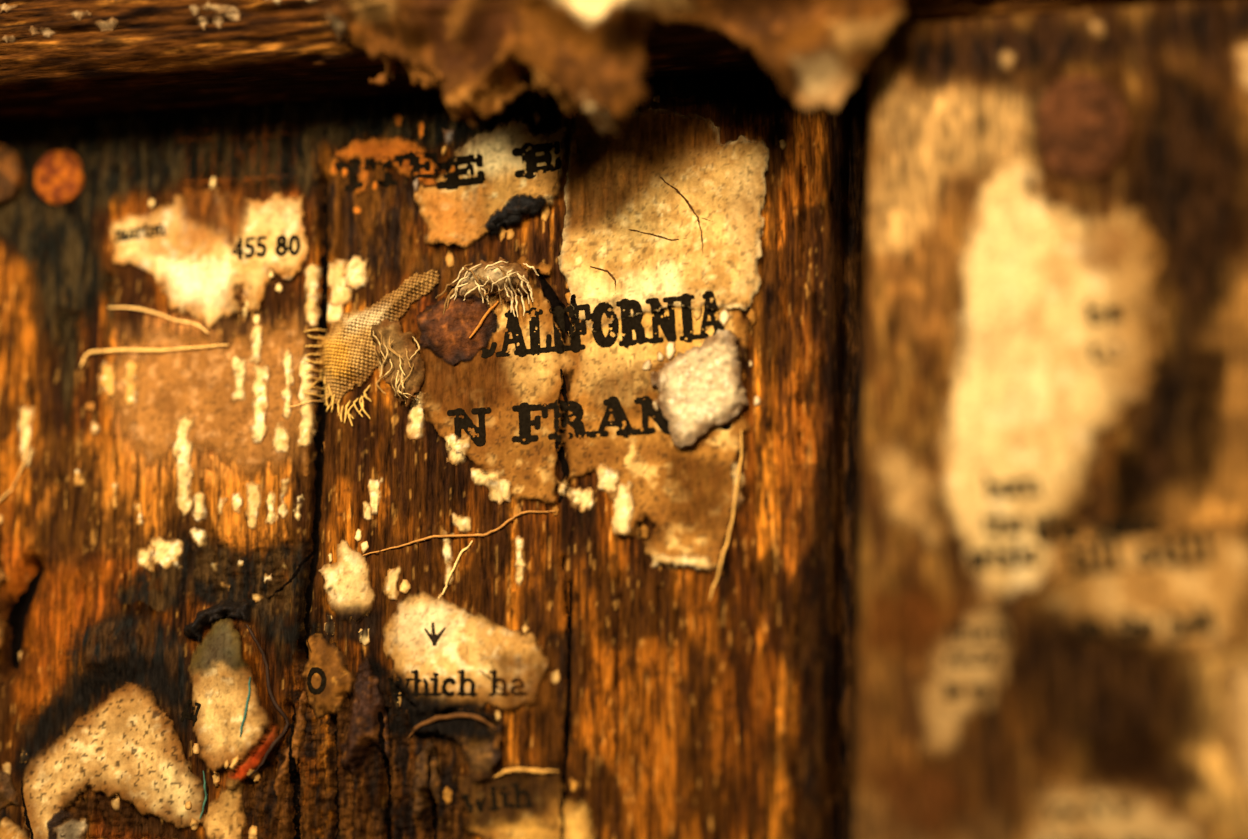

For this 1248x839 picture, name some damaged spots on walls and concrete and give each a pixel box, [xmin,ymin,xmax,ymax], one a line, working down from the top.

peeling [305,256,366,327]
peeling [231,300,321,452]
peeling [18,406,35,467]
peeling [406,391,424,439]
peeling [446,435,510,504]
peeling [354,480,380,554]
peeling [453,514,471,531]
peeling [552,464,649,539]
peeling [385,569,411,600]
peeling [444,538,453,583]
peeling [514,537,525,584]
peeling [651,555,711,572]